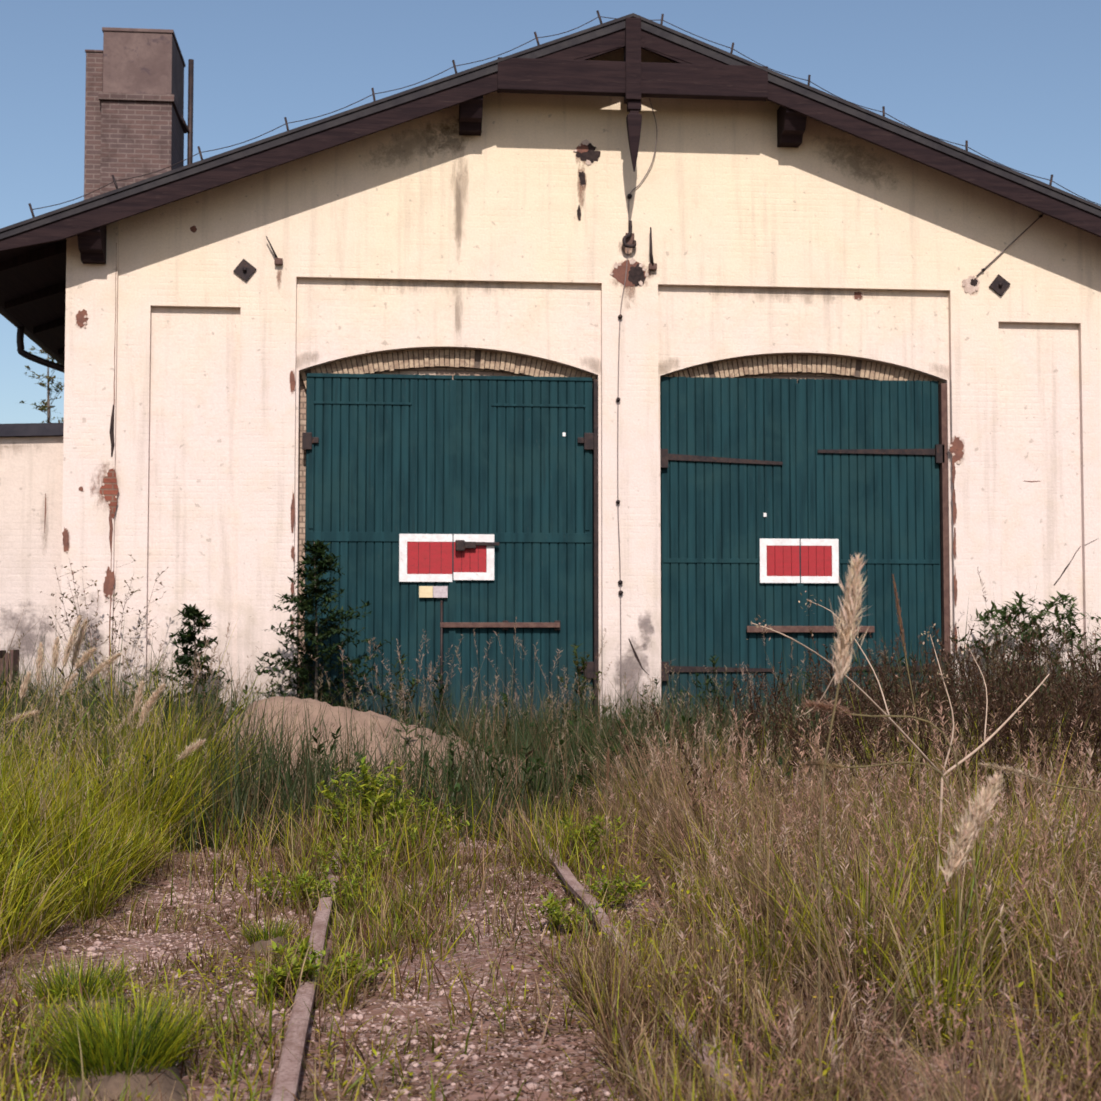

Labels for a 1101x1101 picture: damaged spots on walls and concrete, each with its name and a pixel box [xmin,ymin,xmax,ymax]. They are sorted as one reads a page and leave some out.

flaking render [576,139,601,186]
flaking render [610,258,649,293]
flaking render [99,467,119,520]
flaking render [948,436,964,608]
flaking render [103,566,115,598]